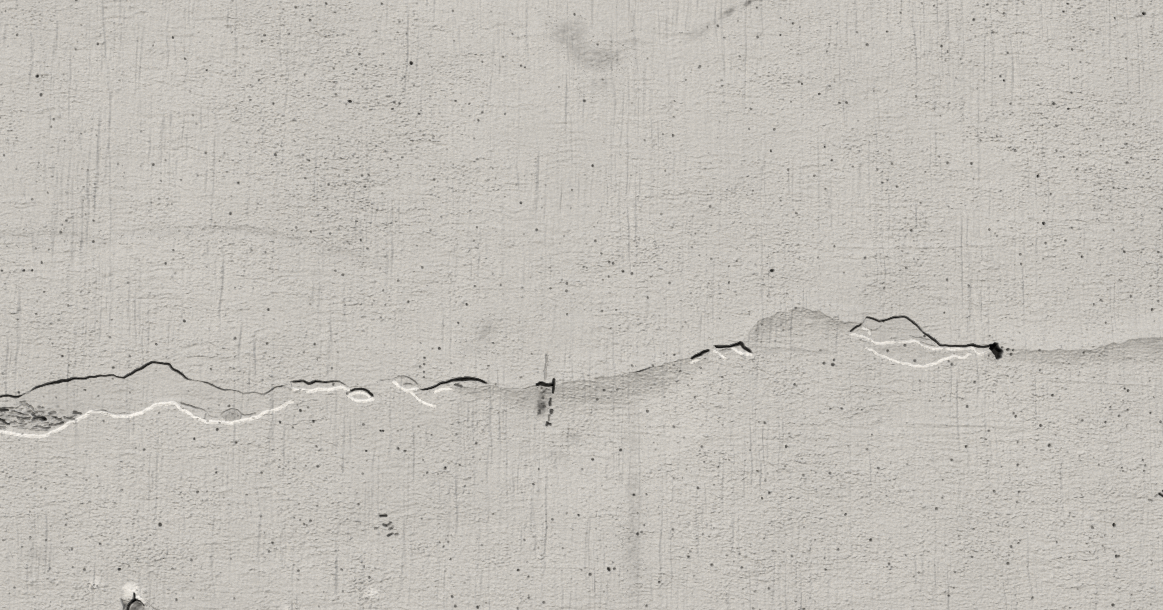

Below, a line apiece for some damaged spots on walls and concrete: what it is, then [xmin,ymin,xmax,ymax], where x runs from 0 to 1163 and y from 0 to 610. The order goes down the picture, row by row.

crack [690,341,835,364]
crack [417,376,536,394]